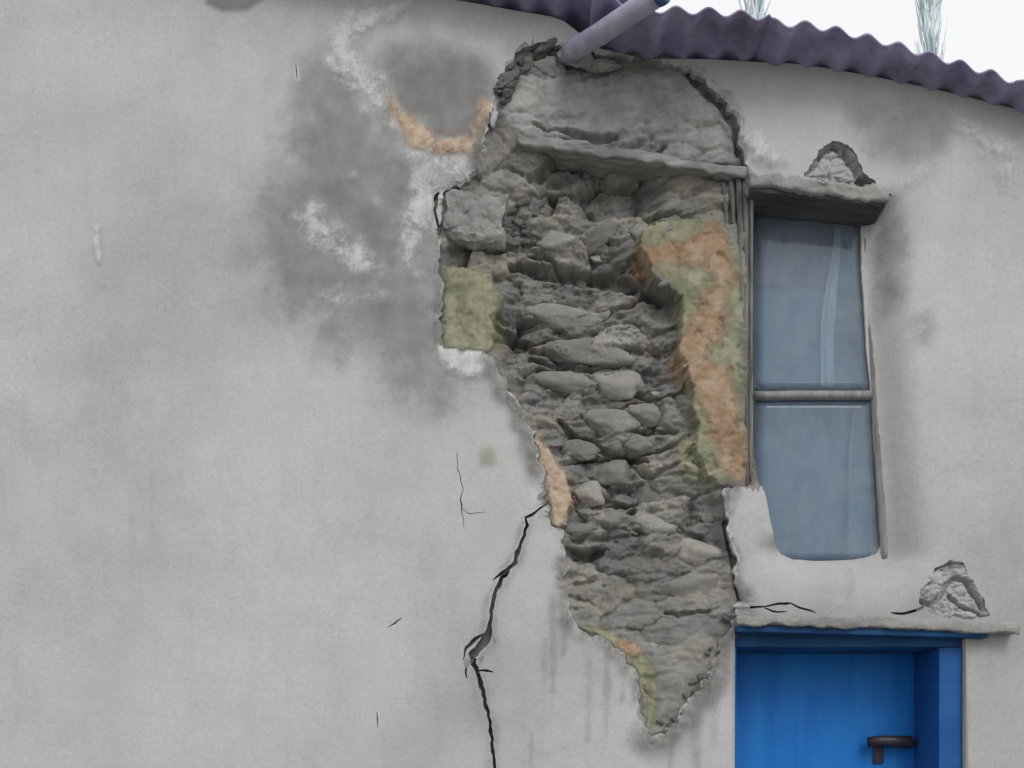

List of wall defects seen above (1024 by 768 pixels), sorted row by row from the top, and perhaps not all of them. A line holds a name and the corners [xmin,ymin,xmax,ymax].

damp [390,53,488,143]
rust [386,98,495,154]
spalling [804,142,875,187]
damp [272,80,502,378]
spalling [324,2,780,750]
rust [633,221,748,480]
rust [534,436,574,527]
crack [463,499,550,768]
crack [750,602,813,613]
crack [891,608,916,616]
spalling [915,560,988,619]